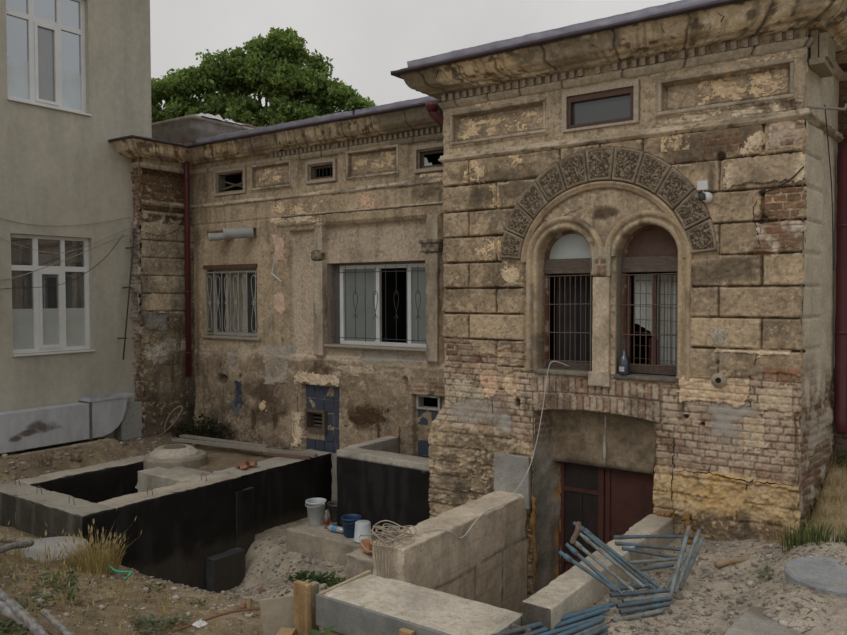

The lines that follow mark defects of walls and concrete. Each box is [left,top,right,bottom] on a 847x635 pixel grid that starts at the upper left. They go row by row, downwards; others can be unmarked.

peeling [457,111,543,141]
peeling [661,49,803,153]
spalling [701,121,808,161]
spalling [752,183,807,260]
spalling [128,157,186,437]
crack [671,432,795,514]